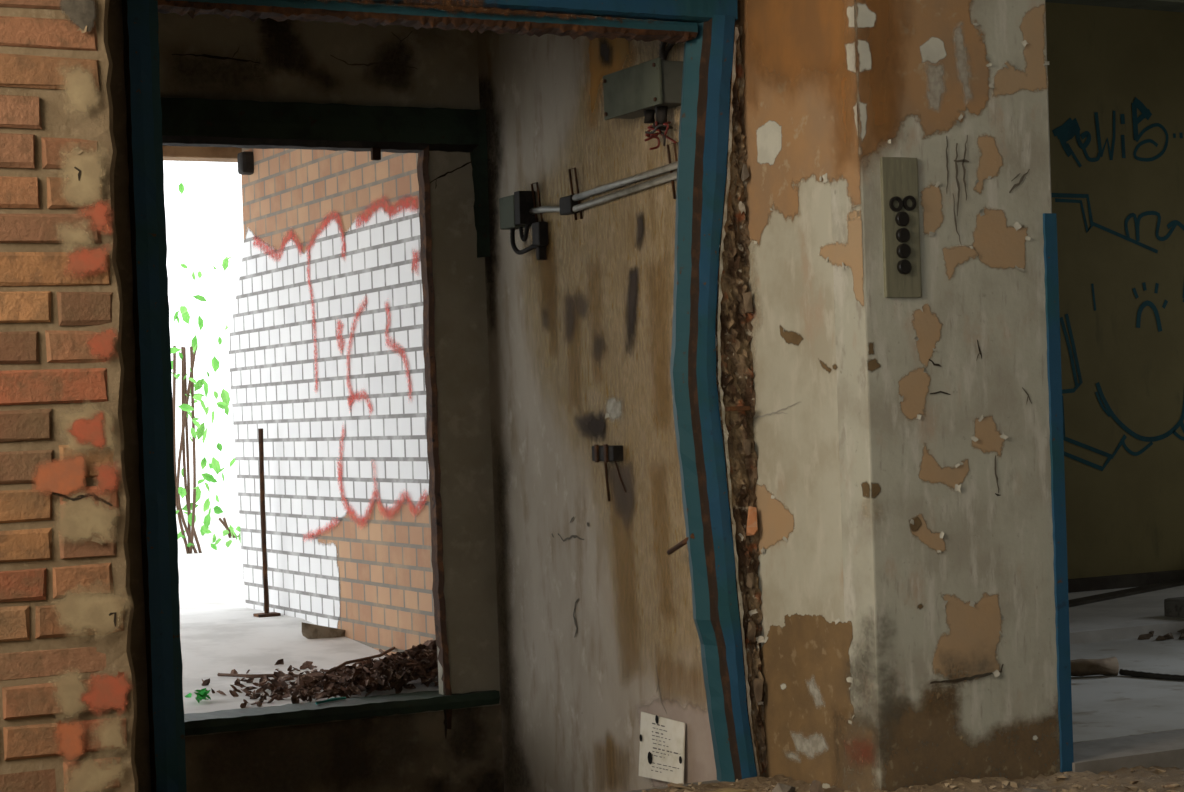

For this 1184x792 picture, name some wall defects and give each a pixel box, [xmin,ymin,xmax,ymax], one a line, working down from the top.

rust [319,0,650,23]
spalling [715,0,1049,787]
spalling [639,698,717,787]